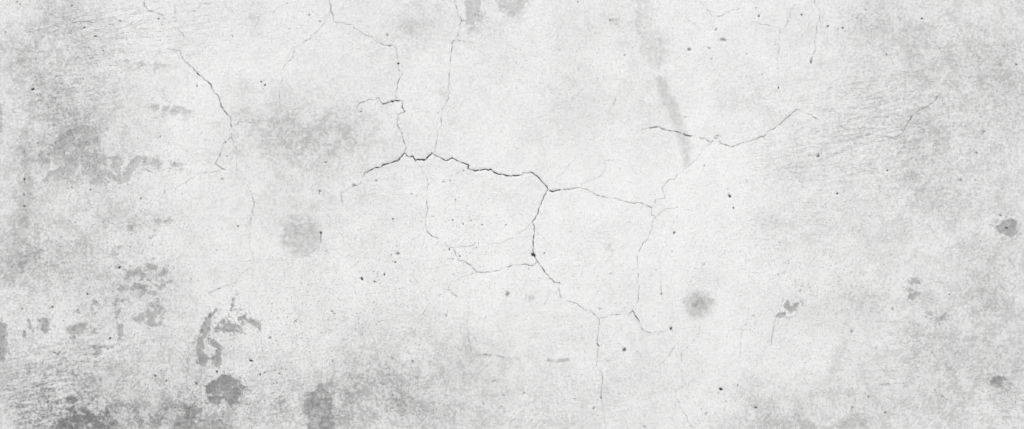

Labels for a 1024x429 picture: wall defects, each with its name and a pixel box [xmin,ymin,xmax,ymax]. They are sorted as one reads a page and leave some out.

crack [367,153,561,283]